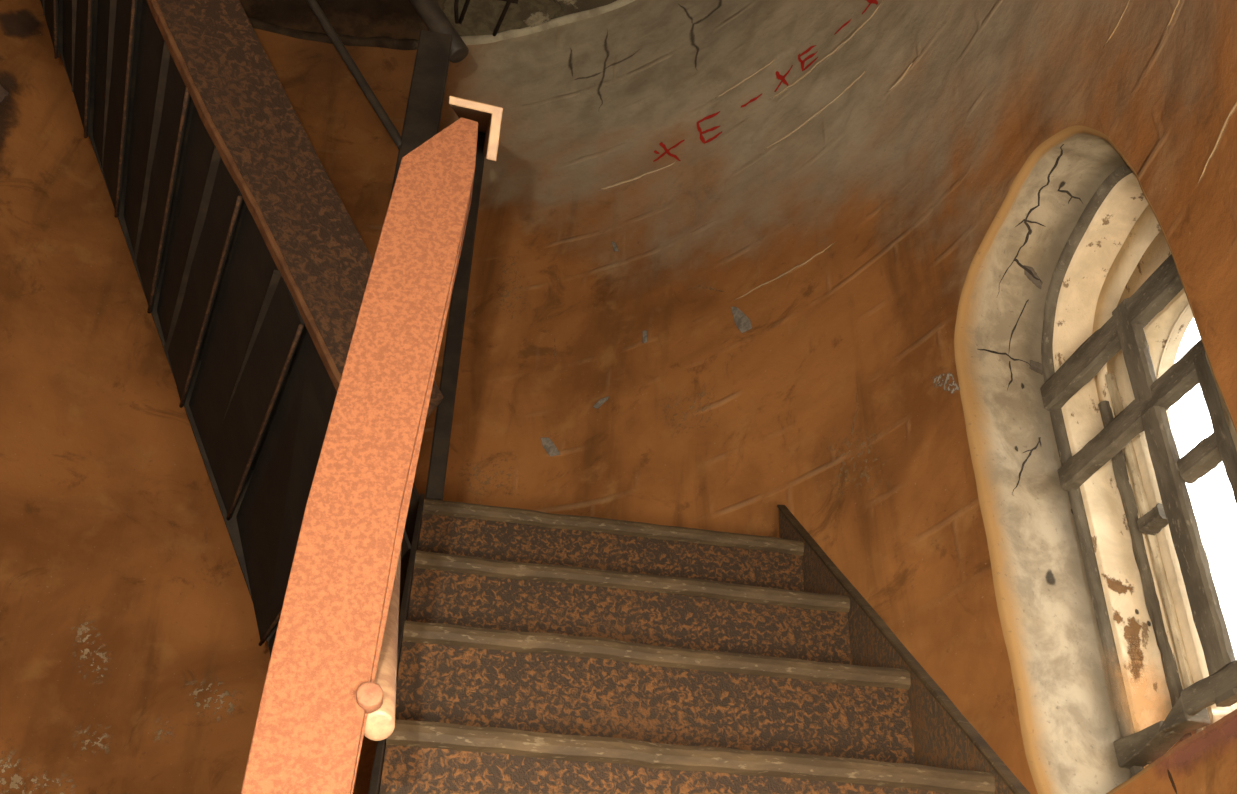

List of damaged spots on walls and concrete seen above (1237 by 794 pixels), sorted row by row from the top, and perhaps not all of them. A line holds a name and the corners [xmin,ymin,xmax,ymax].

crack [681,0,721,67]
crack [569,35,640,108]
crack [977,144,1083,390]
crack [1012,437,1042,493]
peeling [1101,574,1134,594]
peeling [1114,609,1151,680]